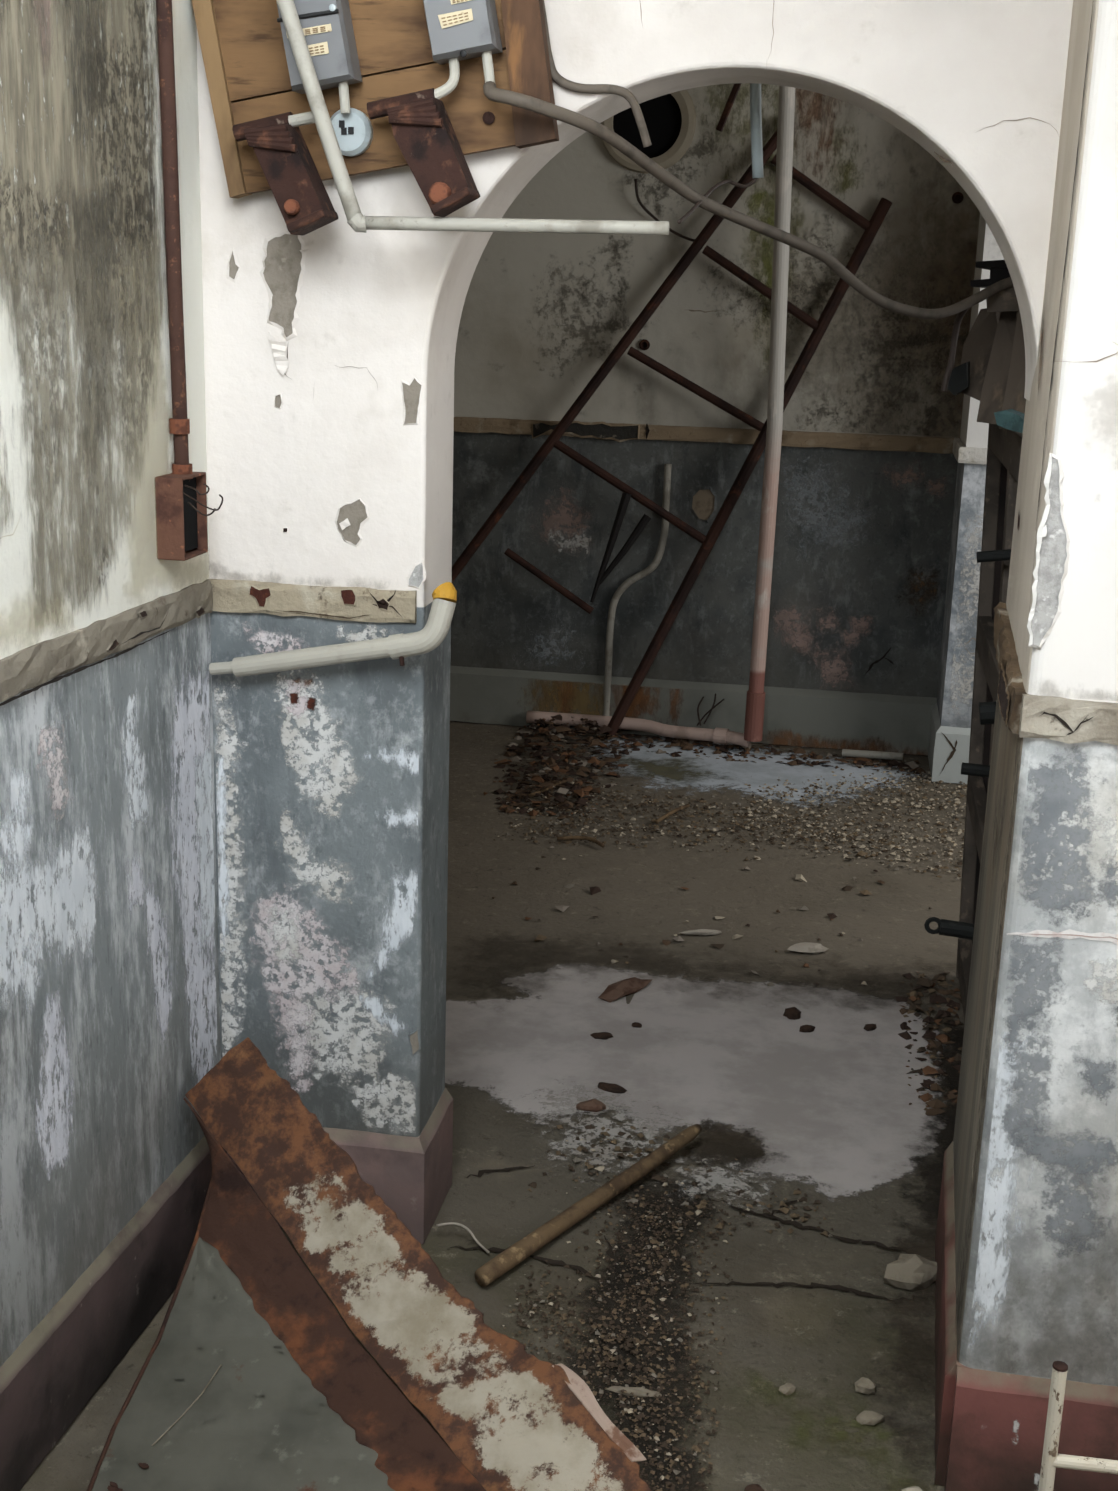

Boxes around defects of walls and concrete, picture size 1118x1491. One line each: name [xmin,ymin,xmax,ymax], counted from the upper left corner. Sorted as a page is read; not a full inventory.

water stain [0,0,165,620]
peeling [259,231,313,375]
peeling [401,377,423,425]
crack [977,7,1118,646]
peeling [335,498,370,547]
peeling [1027,453,1070,648]
water stain [122,693,149,830]
water stain [0,727,100,1181]
water stain [127,670,419,1133]
crack [681,1281,918,1302]
crack [707,1195,904,1250]
efflorescence [968,1034,1033,1348]